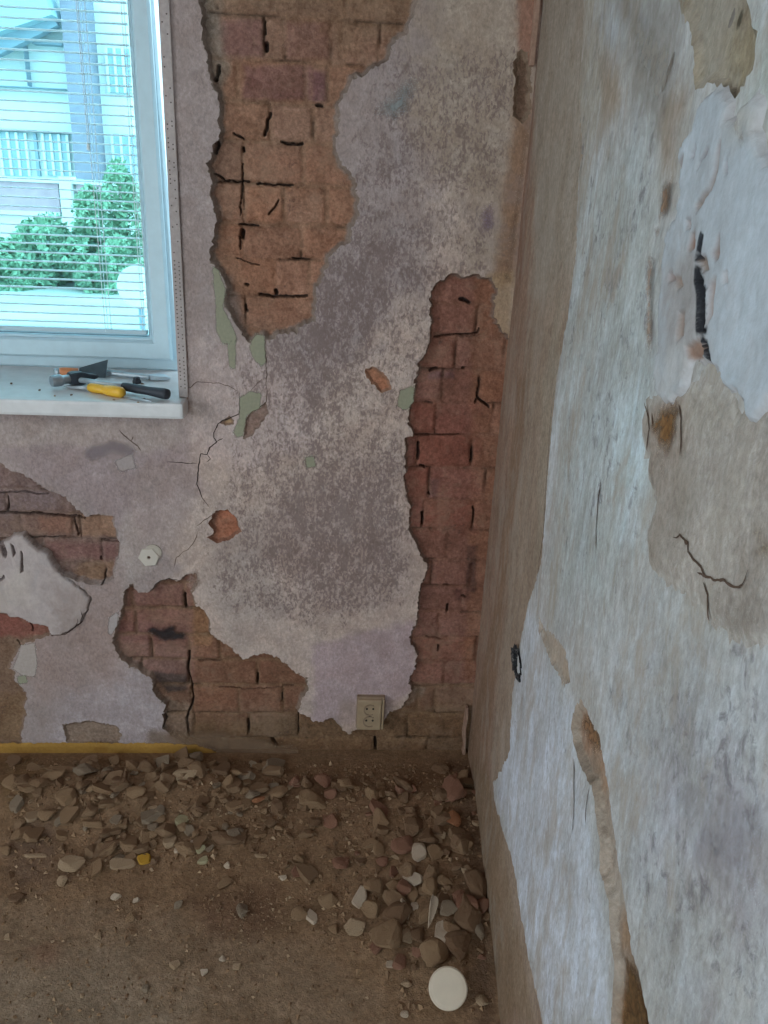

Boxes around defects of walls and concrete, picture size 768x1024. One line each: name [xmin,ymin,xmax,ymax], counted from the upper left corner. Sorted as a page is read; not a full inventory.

flaking render [0,463,122,744]
crack [152,132,267,590]
peeling [109,0,584,1024]
flaking render [642,0,768,650]
crack [673,533,748,620]
flaking render [571,699,629,1024]